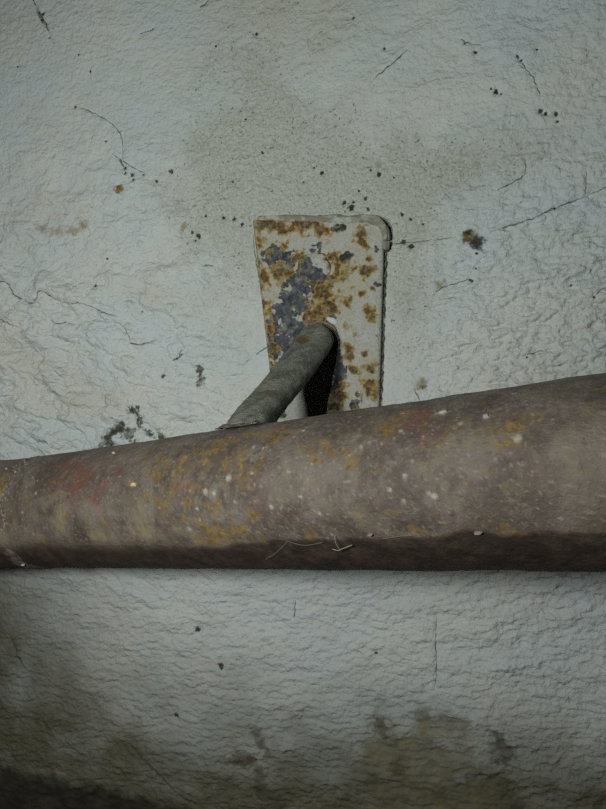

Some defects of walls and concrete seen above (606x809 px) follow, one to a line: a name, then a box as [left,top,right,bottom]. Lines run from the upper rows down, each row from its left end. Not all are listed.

crack [81,108,141,181]
crack [503,176,606,229]
water stain [99,406,165,447]